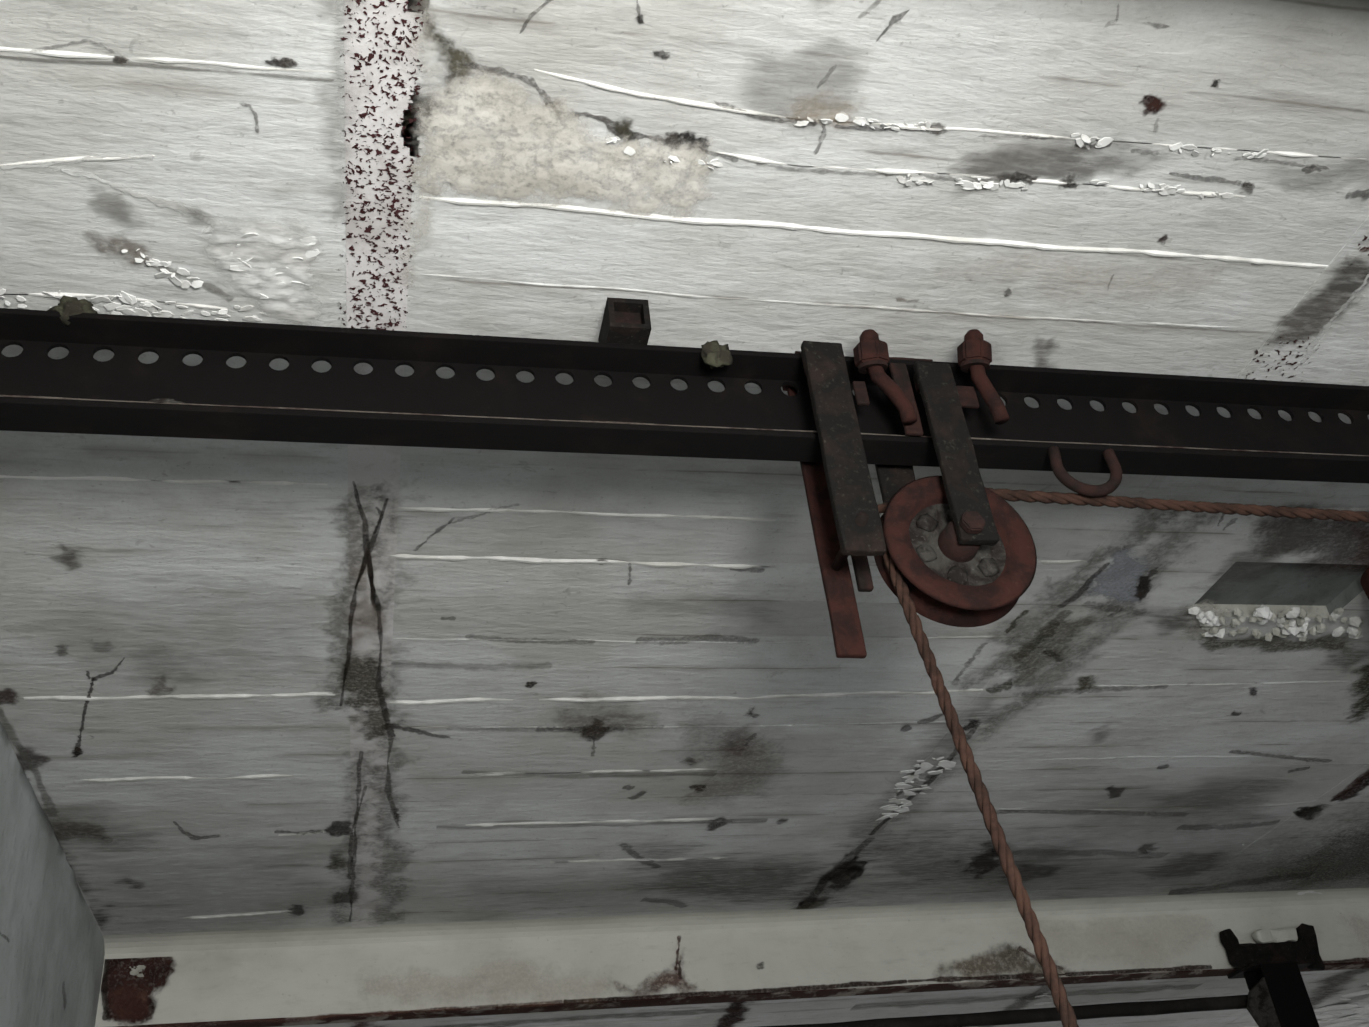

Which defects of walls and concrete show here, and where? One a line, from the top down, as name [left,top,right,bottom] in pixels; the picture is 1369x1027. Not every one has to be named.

spalling [339,0,723,330]
peeling [0,154,320,324]
leakage [1246,260,1369,381]
spalling [1161,603,1364,652]
crack [72,658,124,757]
crack [275,481,448,921]
leakage [1106,787,1124,798]
rust [101,936,1212,1027]